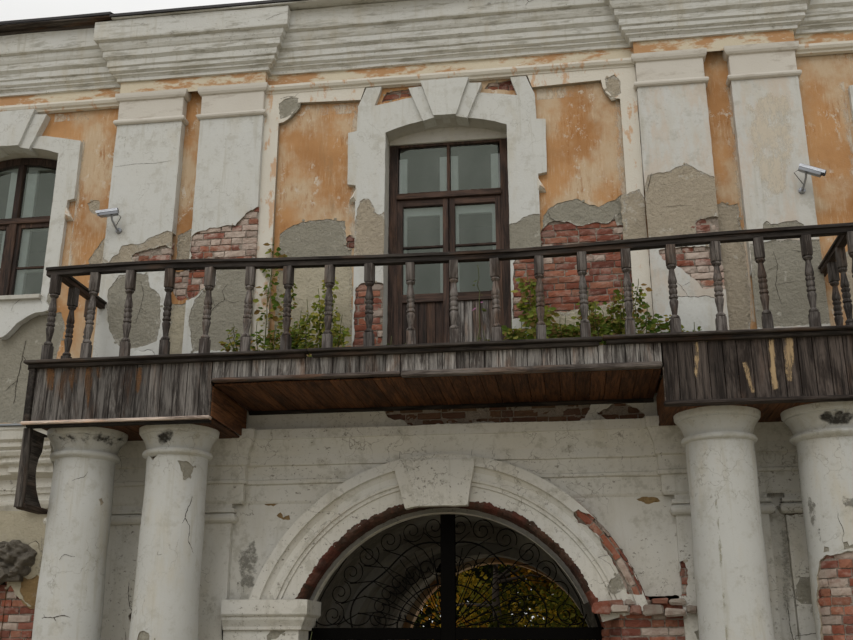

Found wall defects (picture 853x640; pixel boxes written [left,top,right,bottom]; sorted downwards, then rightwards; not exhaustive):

flaking render [89,206,259,264]
flaking render [344,199,385,255]
flaking render [540,162,742,246]
flaking render [160,270,205,354]
flaking render [274,267,383,349]
flaking render [512,252,634,328]
flaking render [676,242,751,330]
flaking render [385,392,645,426]
flaking render [0,575,39,640]
flaking render [295,499,697,640]
flaking render [816,551,853,640]